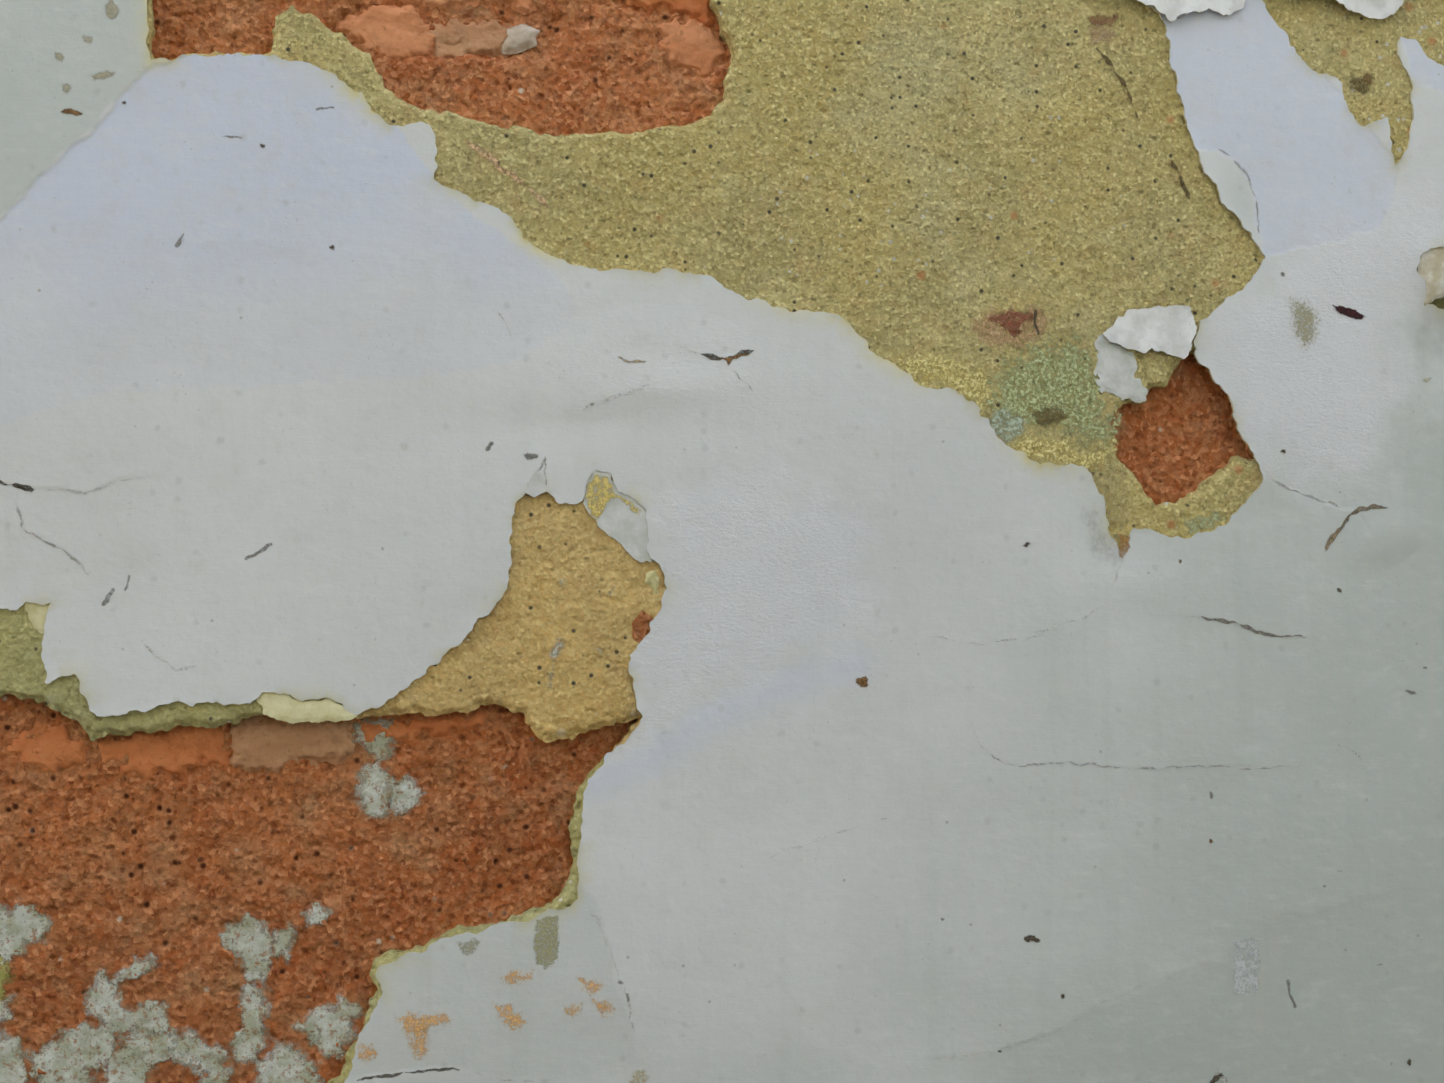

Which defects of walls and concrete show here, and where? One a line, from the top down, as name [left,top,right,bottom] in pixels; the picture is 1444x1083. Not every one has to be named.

flaking render [1263,0,1444,165]
flaking render [146,0,1264,549]
spalling [1417,246,1444,310]
peeling [1333,305,1364,319]
crack [1201,616,1302,637]
spalling [0,470,666,1083]
crack [357,1067,459,1081]